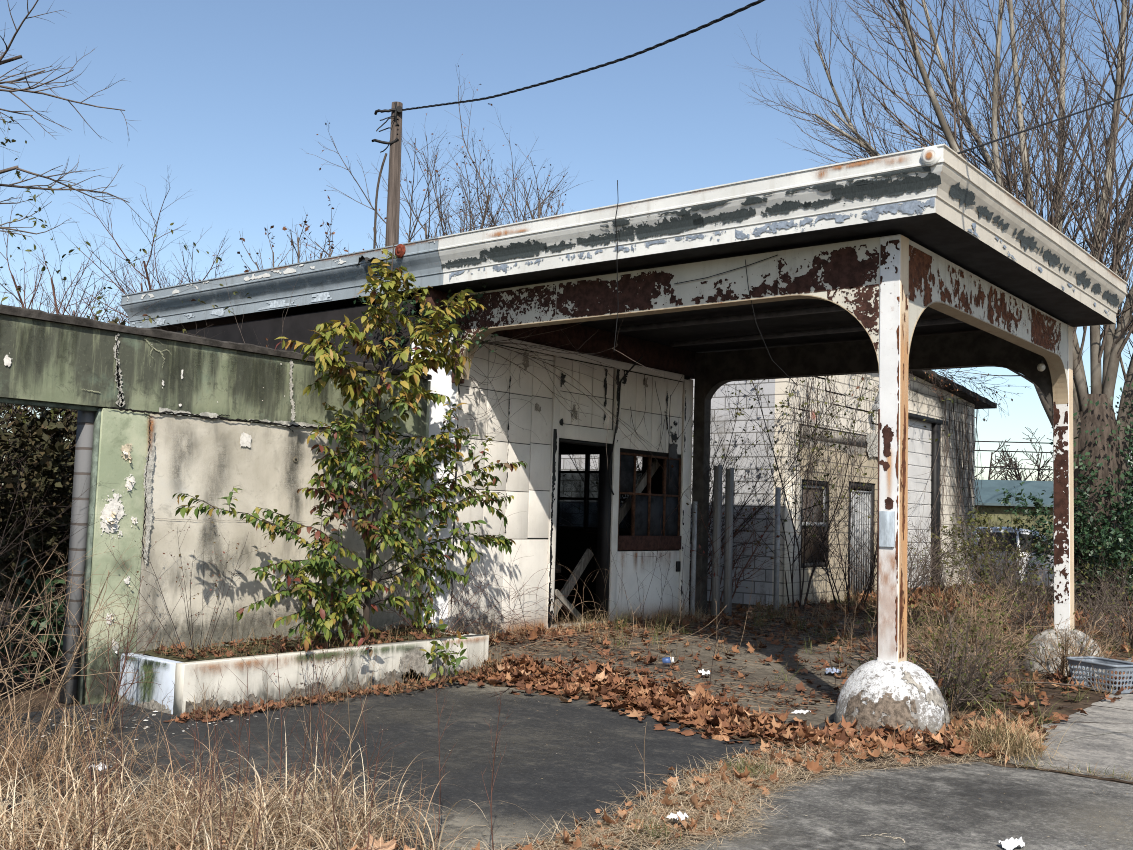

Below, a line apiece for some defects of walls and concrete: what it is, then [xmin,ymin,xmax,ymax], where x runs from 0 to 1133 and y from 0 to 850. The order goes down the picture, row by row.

peeling [441,166,1122,315]
spalling [100,428,155,580]
corrosion [460,239,1061,658]
corrosion [1053,426,1069,603]